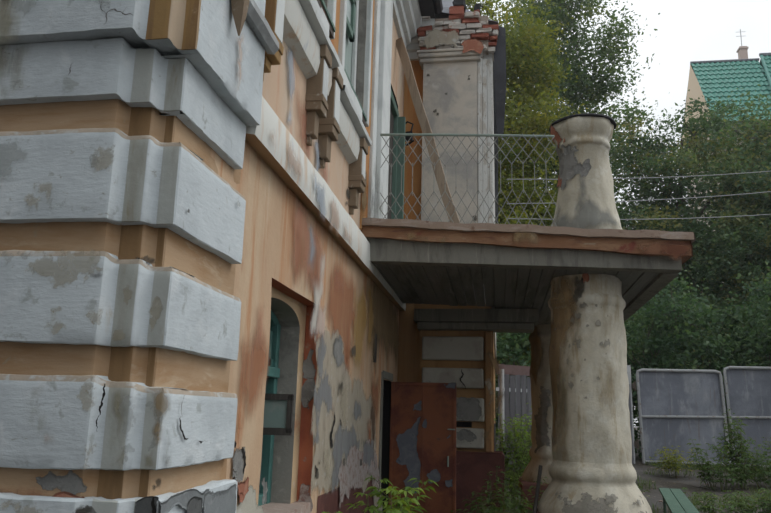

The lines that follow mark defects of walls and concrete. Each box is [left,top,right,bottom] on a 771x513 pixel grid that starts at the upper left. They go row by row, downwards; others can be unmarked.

spalling [416,6,499,61]
spalling [550,125,591,190]
crack [96,384,105,428]
crack [179,395,203,443]
spalling [298,328,383,513]
spalling [36,470,96,513]
peeling [187,447,246,513]
spalling [555,492,618,513]